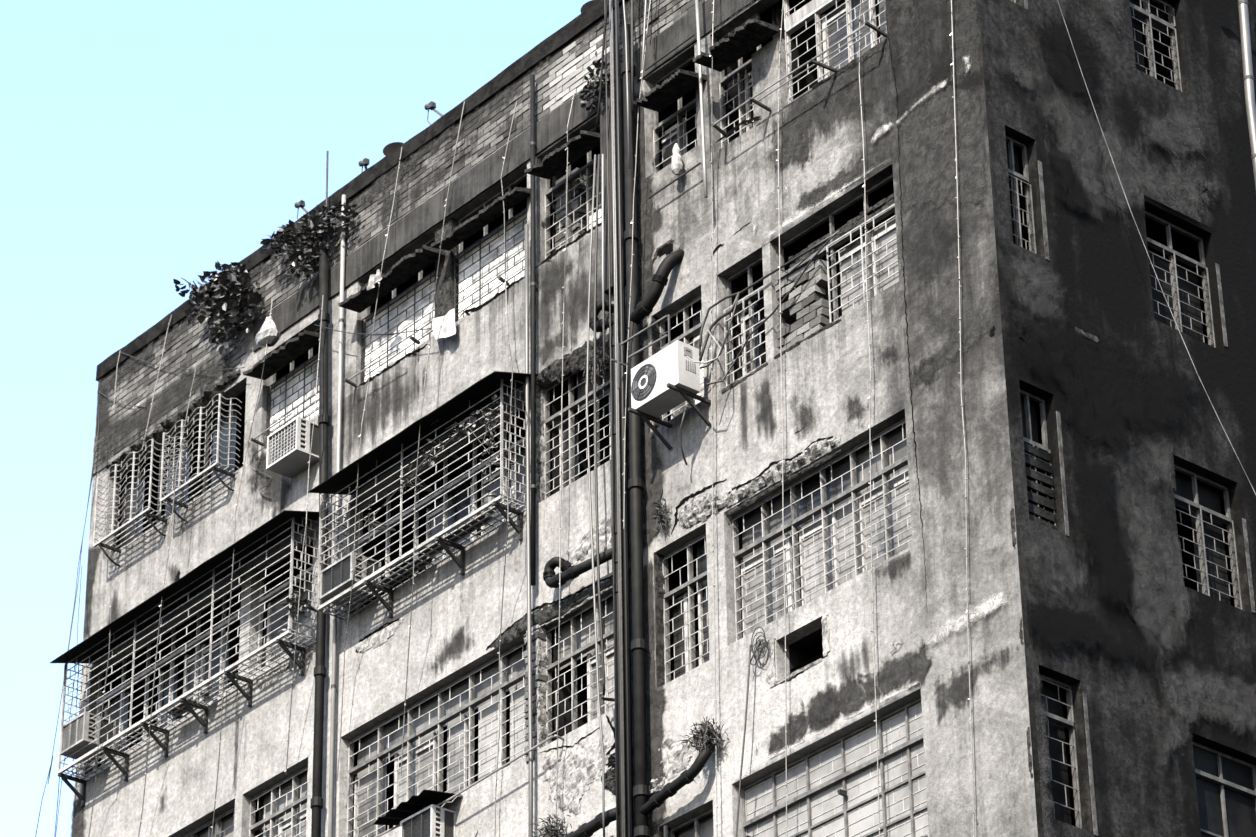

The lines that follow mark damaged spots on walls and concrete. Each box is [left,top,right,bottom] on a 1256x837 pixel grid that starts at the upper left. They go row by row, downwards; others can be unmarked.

leakage [768,0,988,226]
leakage [740,380,776,445]
leakage [790,388,815,436]
leakage [848,395,869,419]
flaking render [678,436,841,529]
leakage [756,640,1009,758]